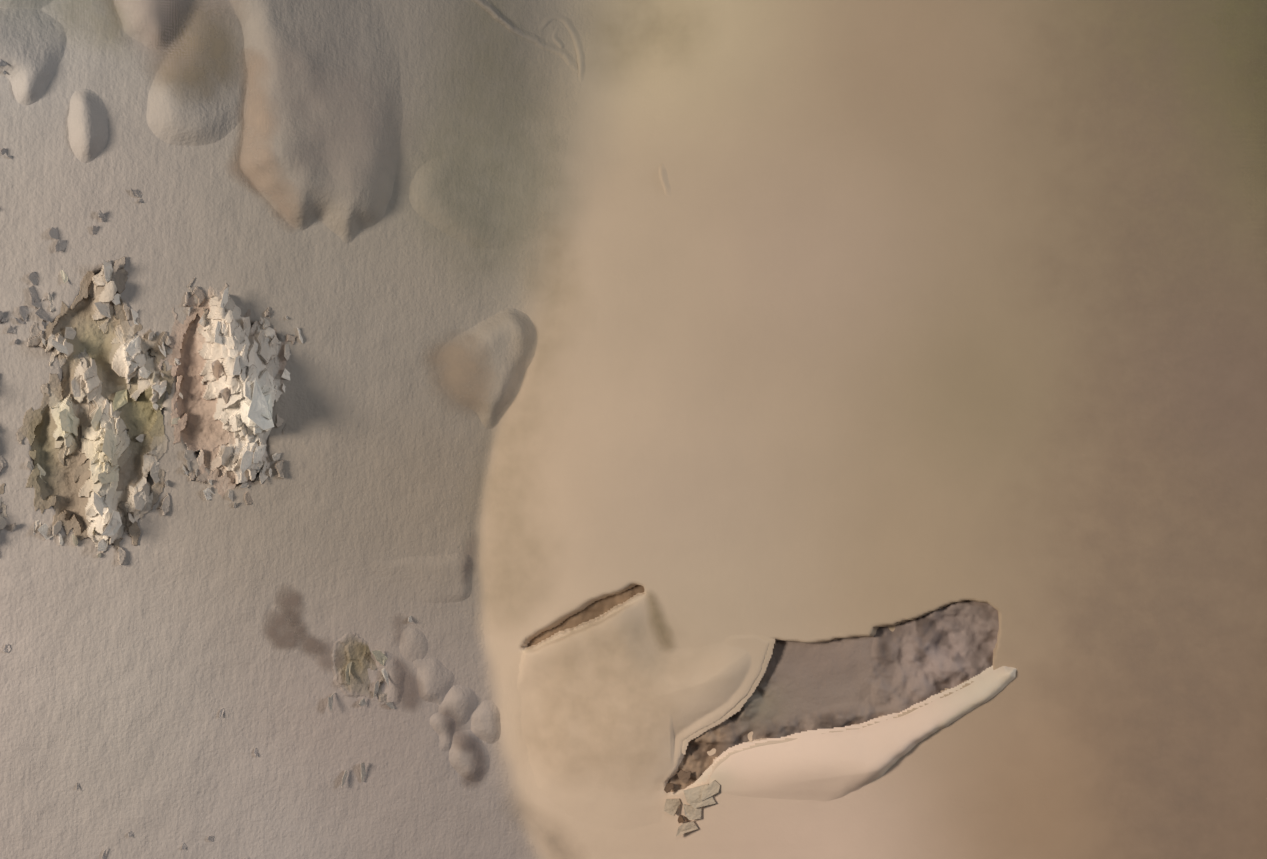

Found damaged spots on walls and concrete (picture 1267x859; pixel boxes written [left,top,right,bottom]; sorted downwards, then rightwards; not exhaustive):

peeling [49,227,67,252]
peeling [0,257,303,565]
peeling [328,632,395,711]
flaking render [517,585,1017,836]